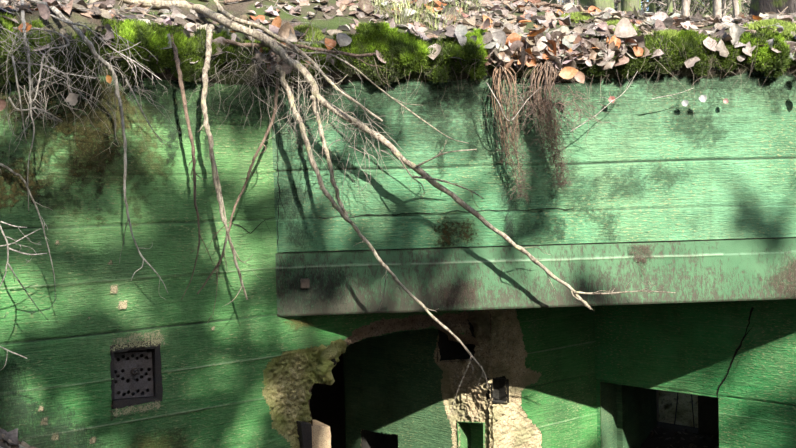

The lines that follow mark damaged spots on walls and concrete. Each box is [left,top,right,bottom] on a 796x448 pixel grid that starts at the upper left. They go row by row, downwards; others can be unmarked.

spalling [262,308,542,448]
crack [717,307,755,398]